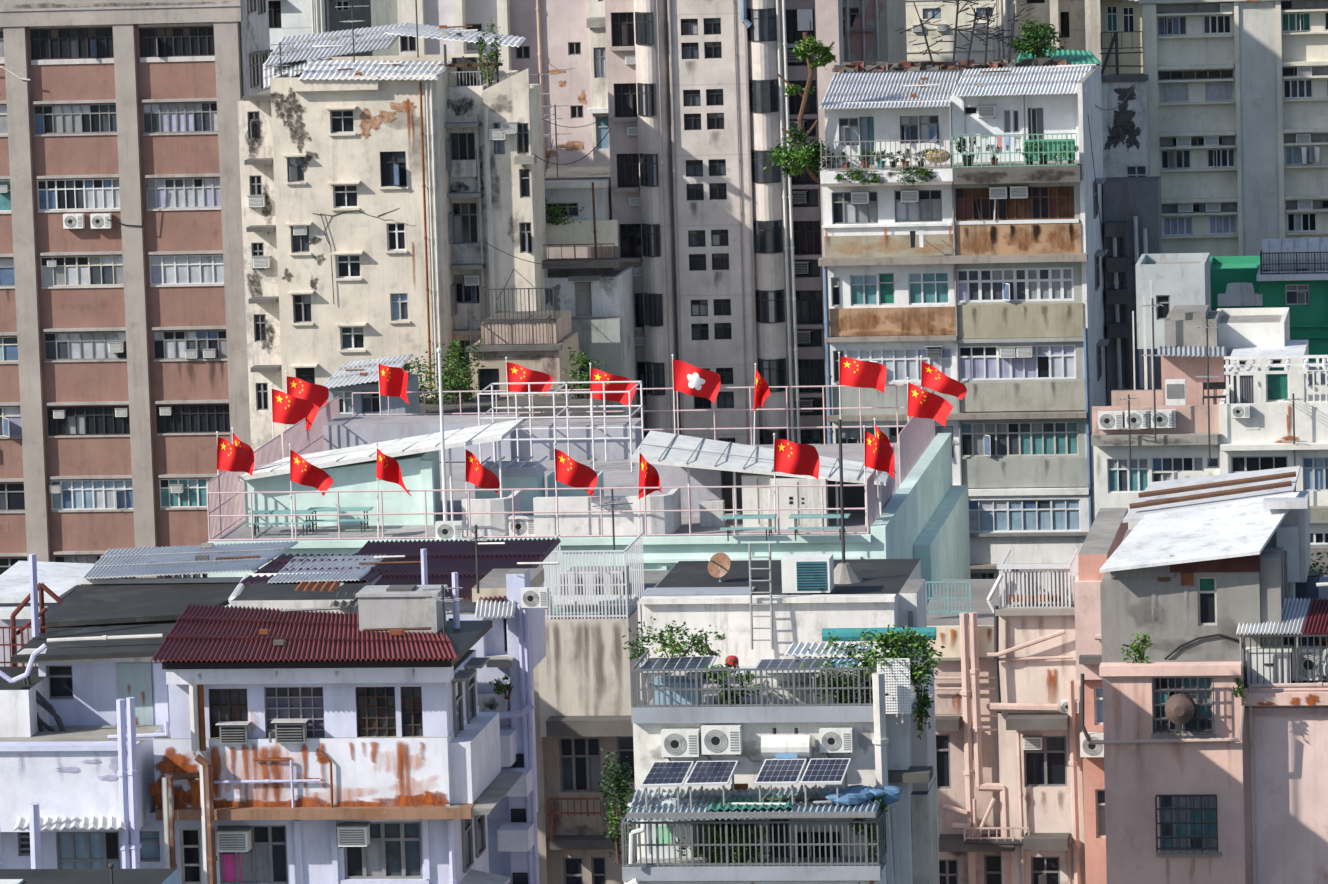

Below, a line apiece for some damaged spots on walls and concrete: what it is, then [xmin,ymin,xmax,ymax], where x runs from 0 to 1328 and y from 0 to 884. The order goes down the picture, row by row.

spalling [269,87,319,171]
spalling [359,100,417,139]
spalling [1104,86,1142,152]
leakage [990,225,1014,244]
rust [1257,694,1319,706]
rust [148,742,449,808]